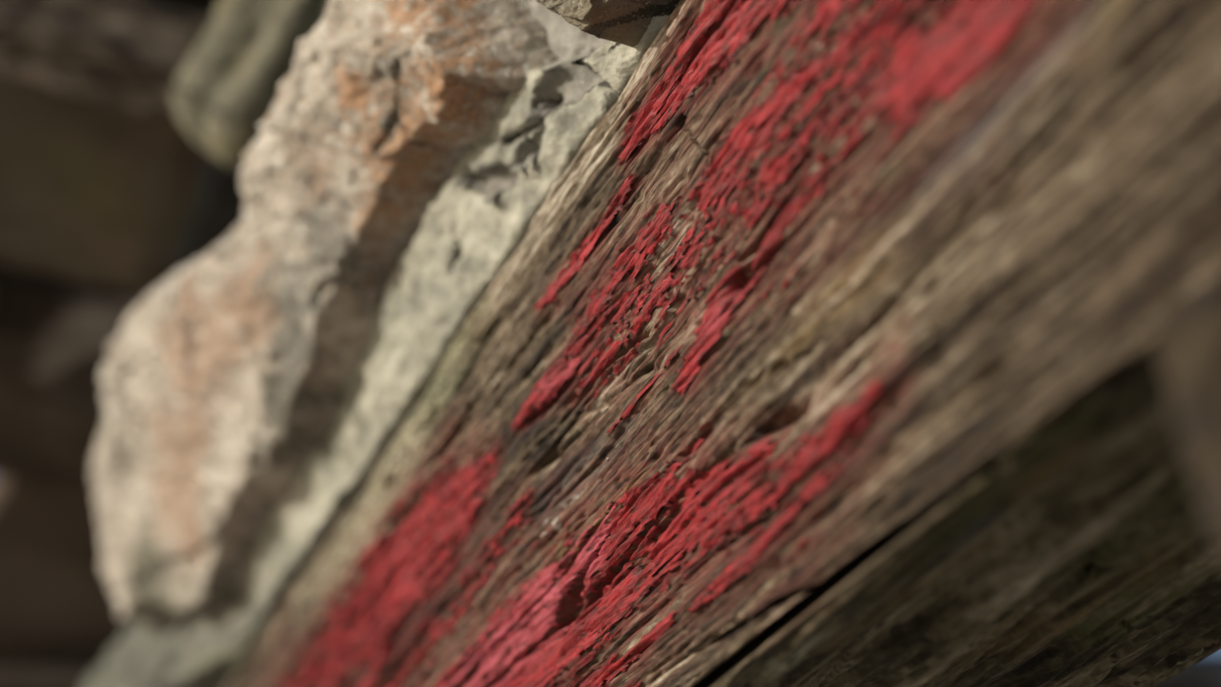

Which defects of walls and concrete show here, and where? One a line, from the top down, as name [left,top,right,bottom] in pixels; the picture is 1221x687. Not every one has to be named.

peeling [275,0,1038,687]
crack [694,434,1035,687]